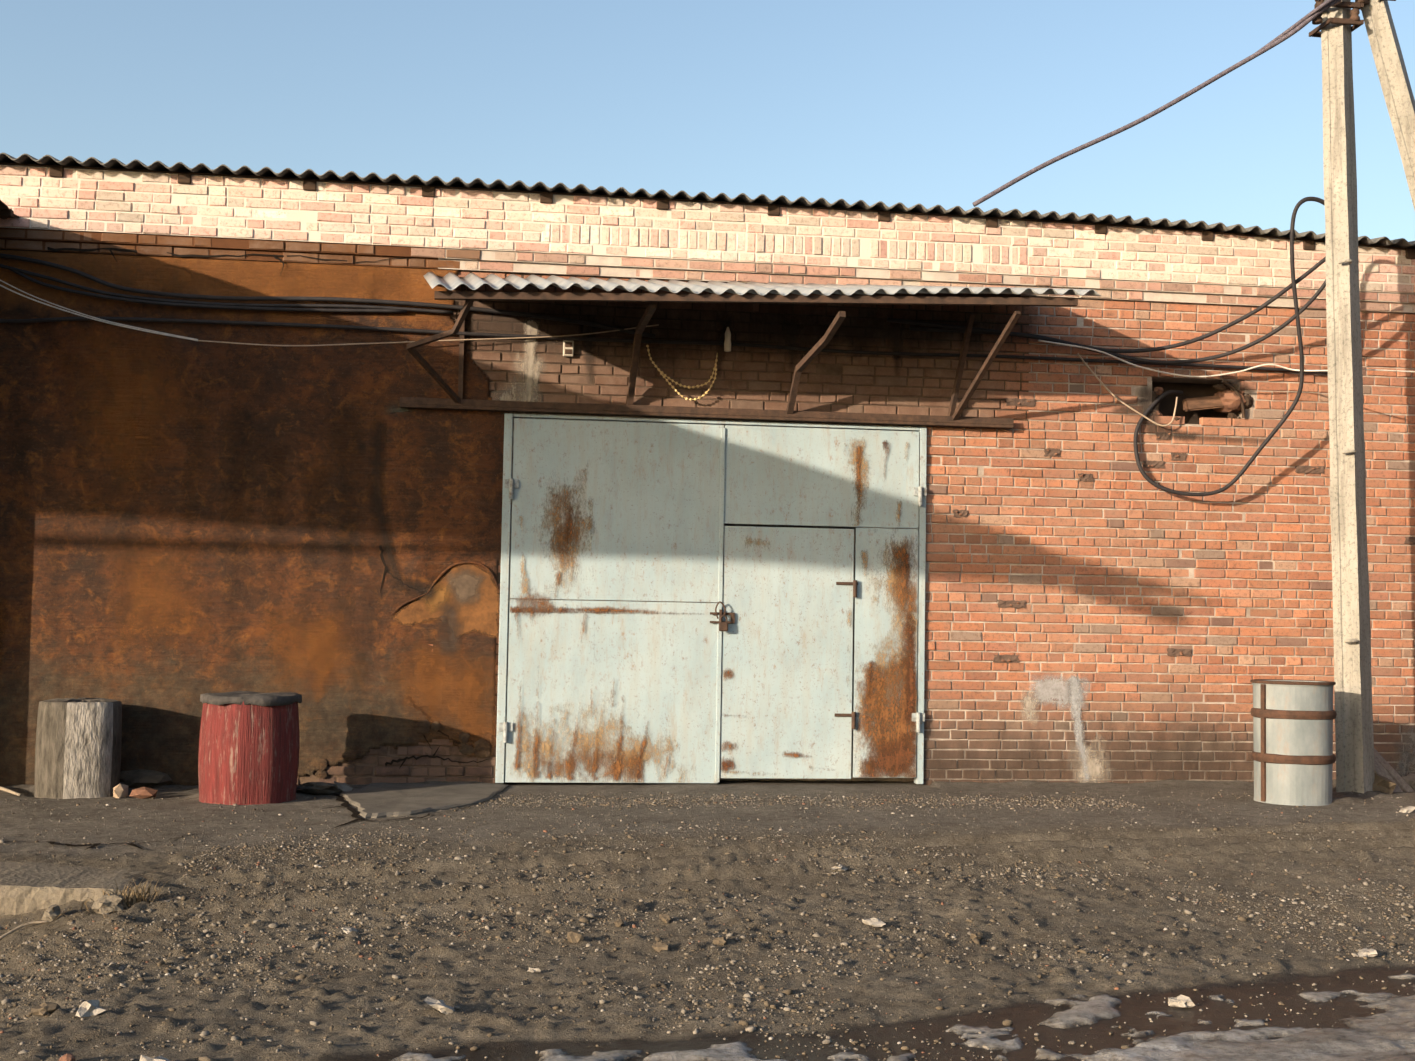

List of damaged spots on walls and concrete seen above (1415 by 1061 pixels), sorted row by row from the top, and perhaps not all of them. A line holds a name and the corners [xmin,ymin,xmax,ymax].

spalling [1143,380,1253,469]
crack [379,545,393,592]
peeling [391,561,500,651]
corrosion [510,475,684,632]
corrosion [857,540,917,777]
spalling [297,719,493,785]
corrosion [514,687,685,783]
leakage [1023,677,1226,784]